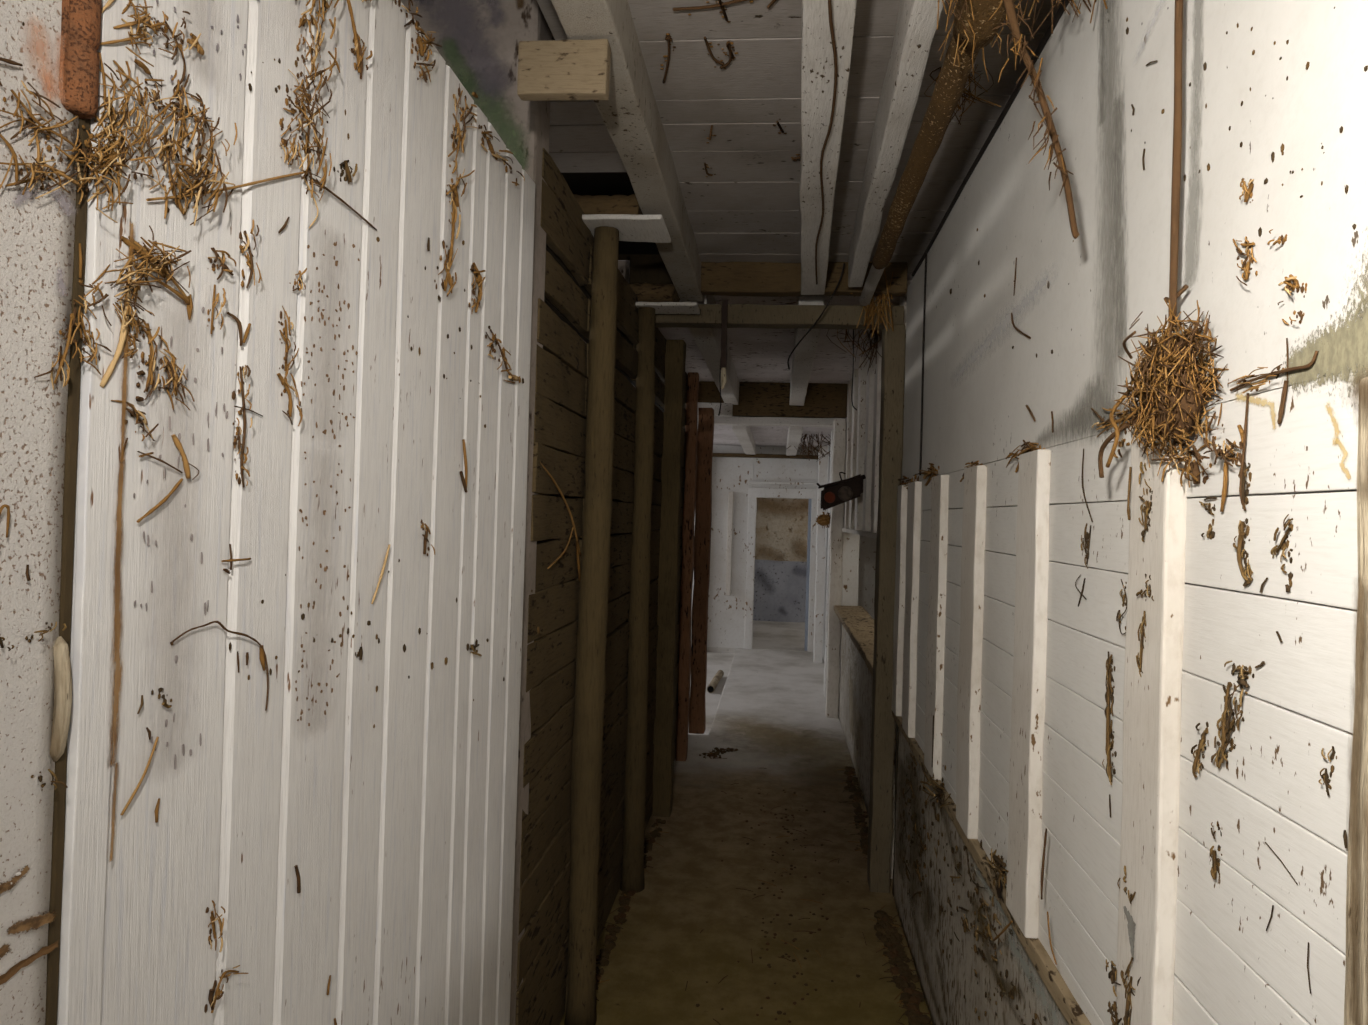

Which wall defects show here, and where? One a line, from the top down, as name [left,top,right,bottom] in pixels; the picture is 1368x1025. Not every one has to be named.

damp [431,0,504,92]